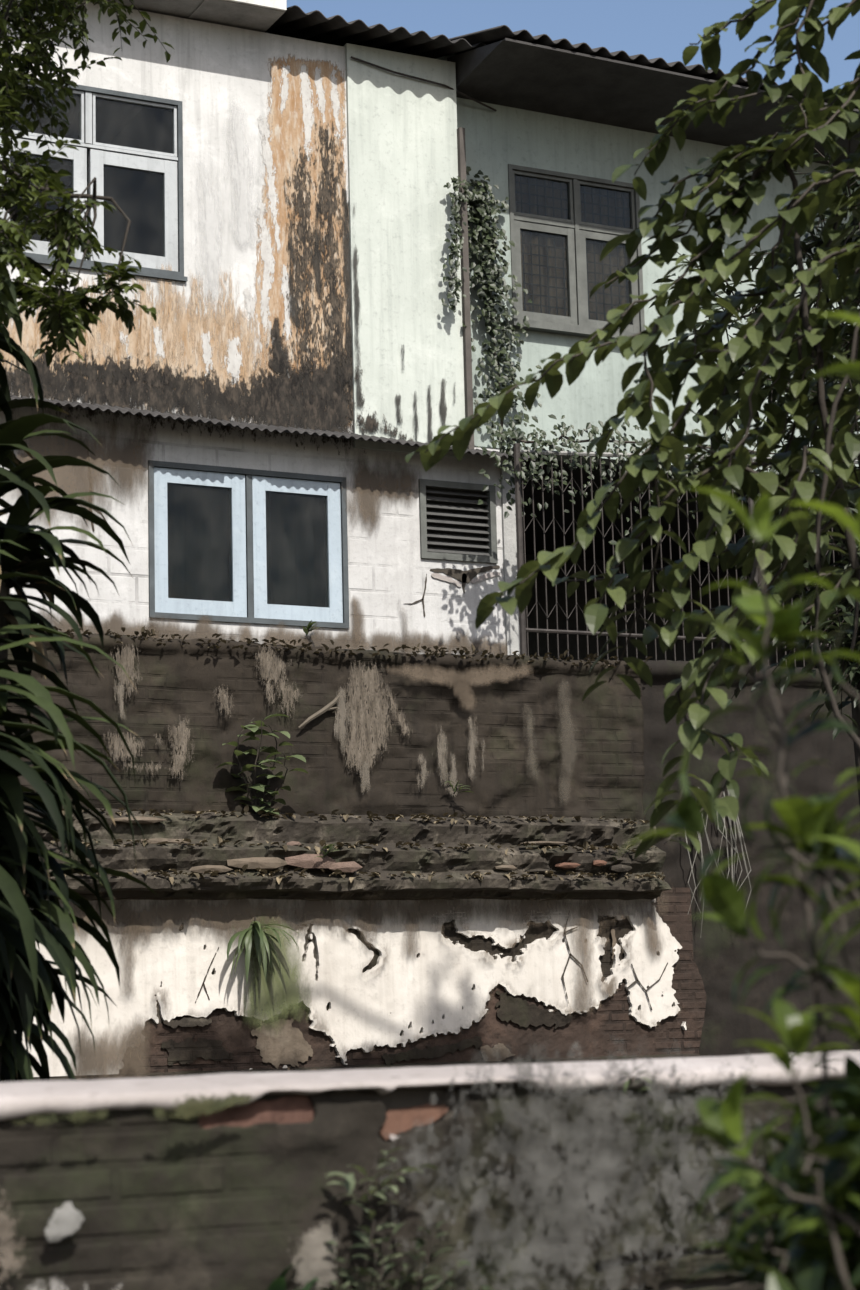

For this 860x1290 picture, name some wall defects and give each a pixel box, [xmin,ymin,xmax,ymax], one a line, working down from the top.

leakage [0,110,455,527]
leakage [418,717,485,796]
leakage [527,717,535,771]
leakage [560,683,575,800]
spalling [119,912,706,1078]
crack [561,912,586,1004]
crack [626,963,668,1010]
leakage [381,1078,536,1290]
leakage [634,1074,777,1269]